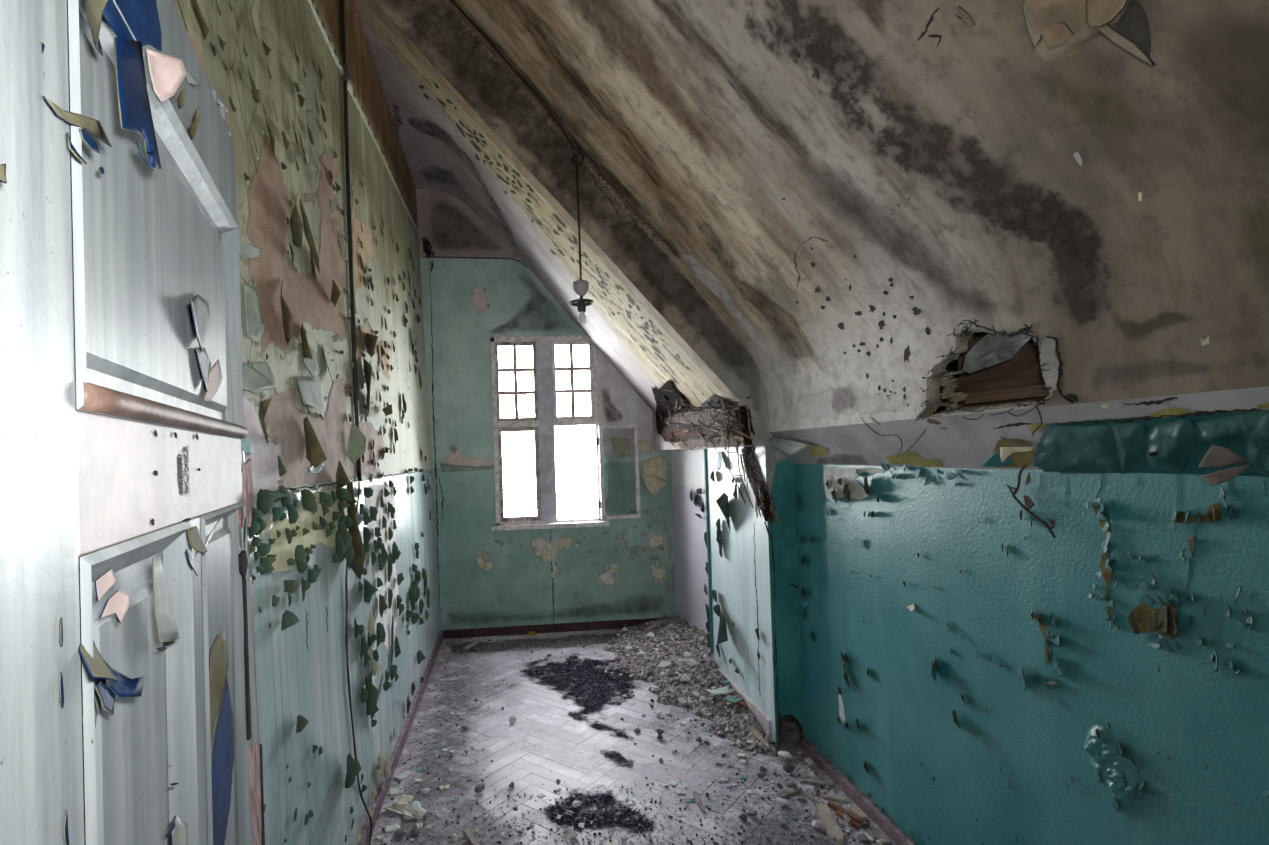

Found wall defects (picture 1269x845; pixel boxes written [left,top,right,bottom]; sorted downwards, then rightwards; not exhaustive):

peeling [43,96,112,174]
damp [747,0,1109,324]
flaking render [84,0,495,727]
flaking render [866,329,1059,425]
spalling [473,380,1045,684]
spalling [1083,498,1241,674]
peeling [1171,487,1234,530]
peeling [78,632,145,743]
peeling [209,631,234,845]
peeling [296,715,309,733]
flaking render [837,652,860,732]
peeling [163,815,188,845]